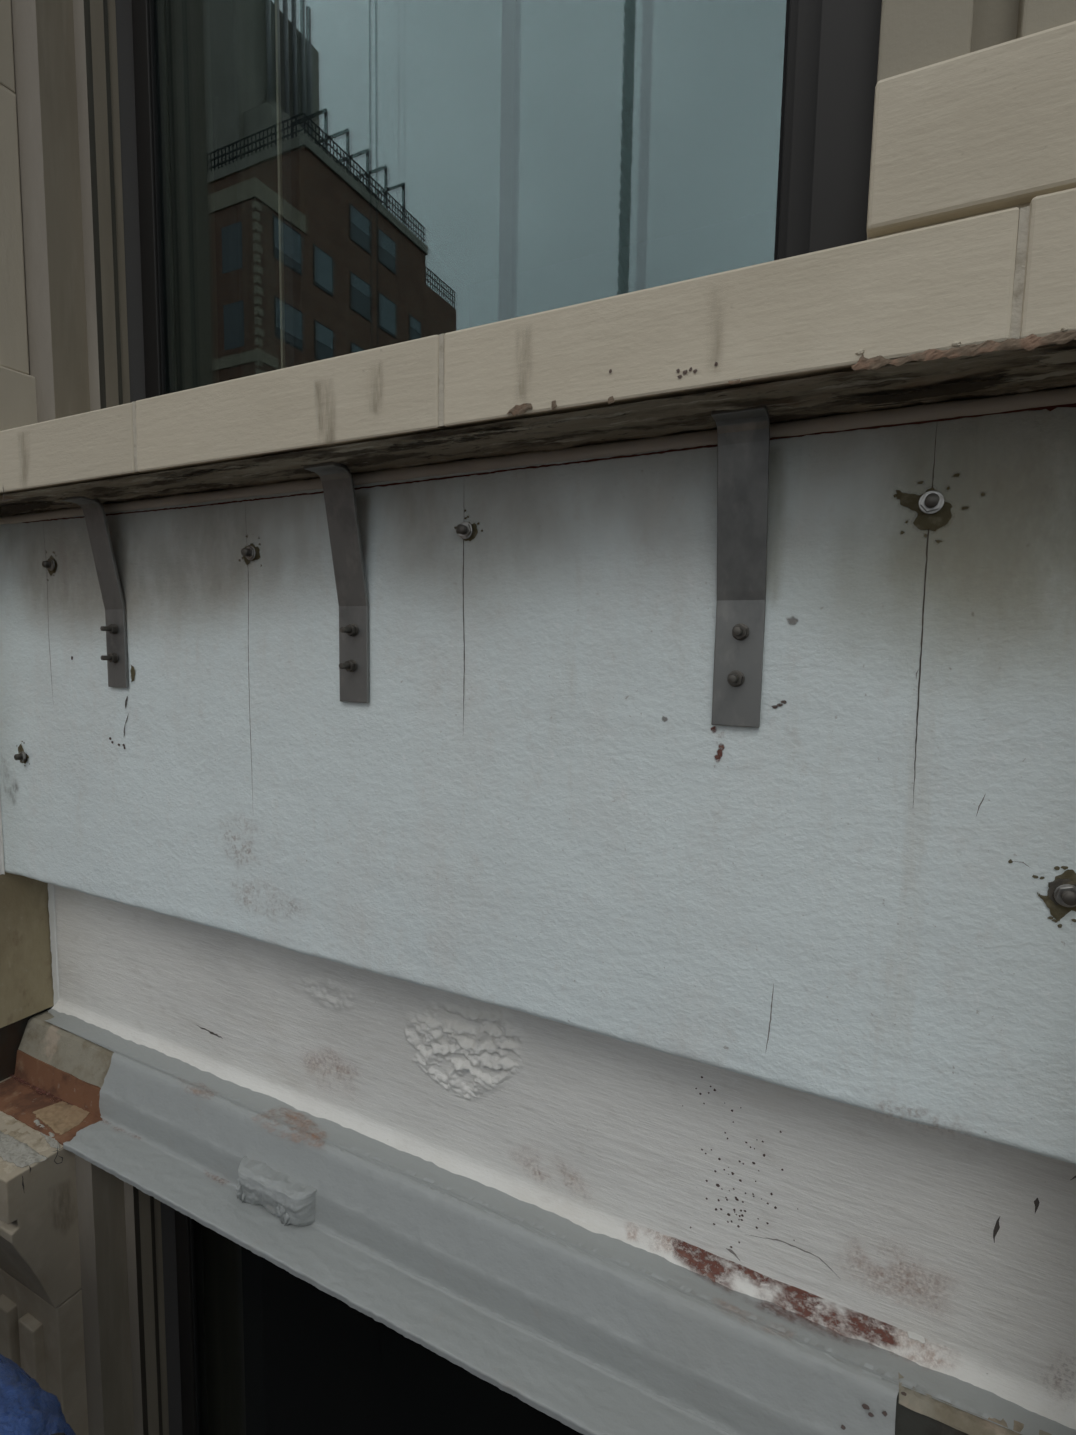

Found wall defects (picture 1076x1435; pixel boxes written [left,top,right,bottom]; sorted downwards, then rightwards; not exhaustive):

peeling [852,326,1076,370]
peeling [387,400,564,452]
corrosion [10,1073,90,1135]
corrosion [668,1240,925,1345]